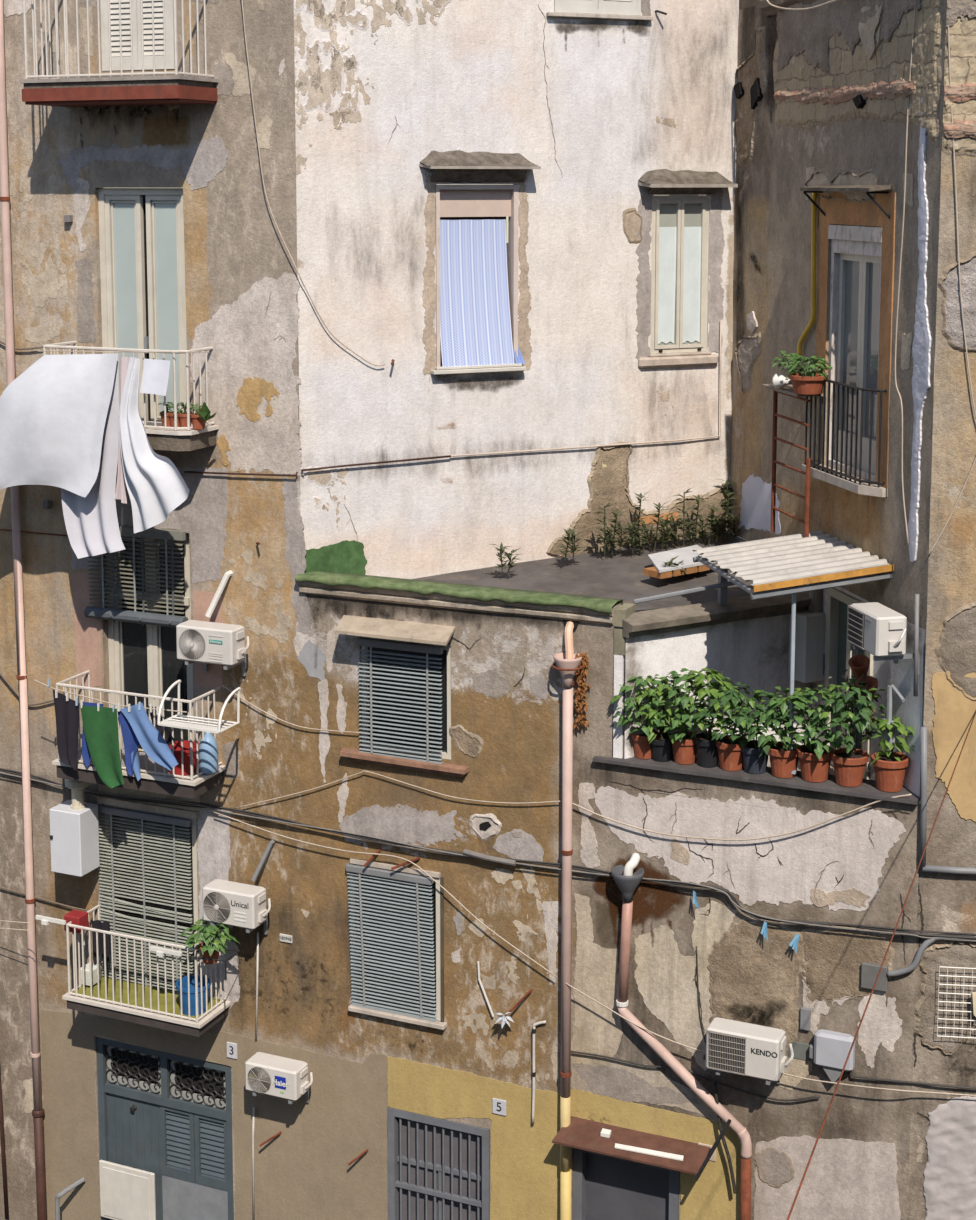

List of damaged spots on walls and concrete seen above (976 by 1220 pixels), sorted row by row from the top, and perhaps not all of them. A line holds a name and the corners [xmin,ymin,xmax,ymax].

flaking render [279,0,451,133]
flaking render [733,0,976,173]
flaking render [938,250,976,353]
peeling [189,272,349,527]
flaking render [546,442,730,557]
peeling [931,601,976,822]
flaking render [469,813,502,841]
peeling [475,865,560,991]
rust [594,858,684,942]
peeling [578,783,976,1090]
peeling [462,1011,519,1072]
peeling [536,893,725,1123]